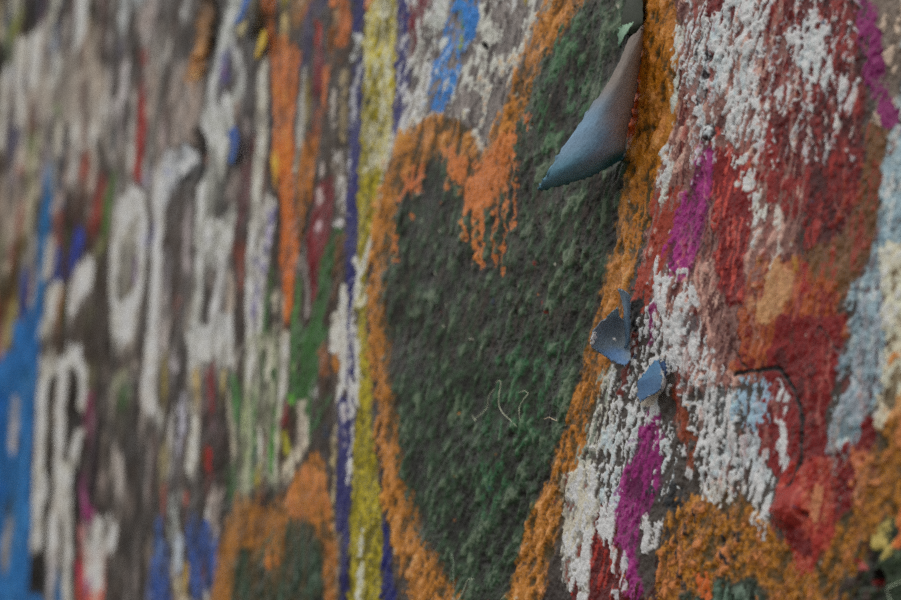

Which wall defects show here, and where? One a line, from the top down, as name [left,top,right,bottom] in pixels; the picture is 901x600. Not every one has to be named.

peeling [537,0,645,191]
peeling [590,288,644,366]
peeling [636,358,667,407]